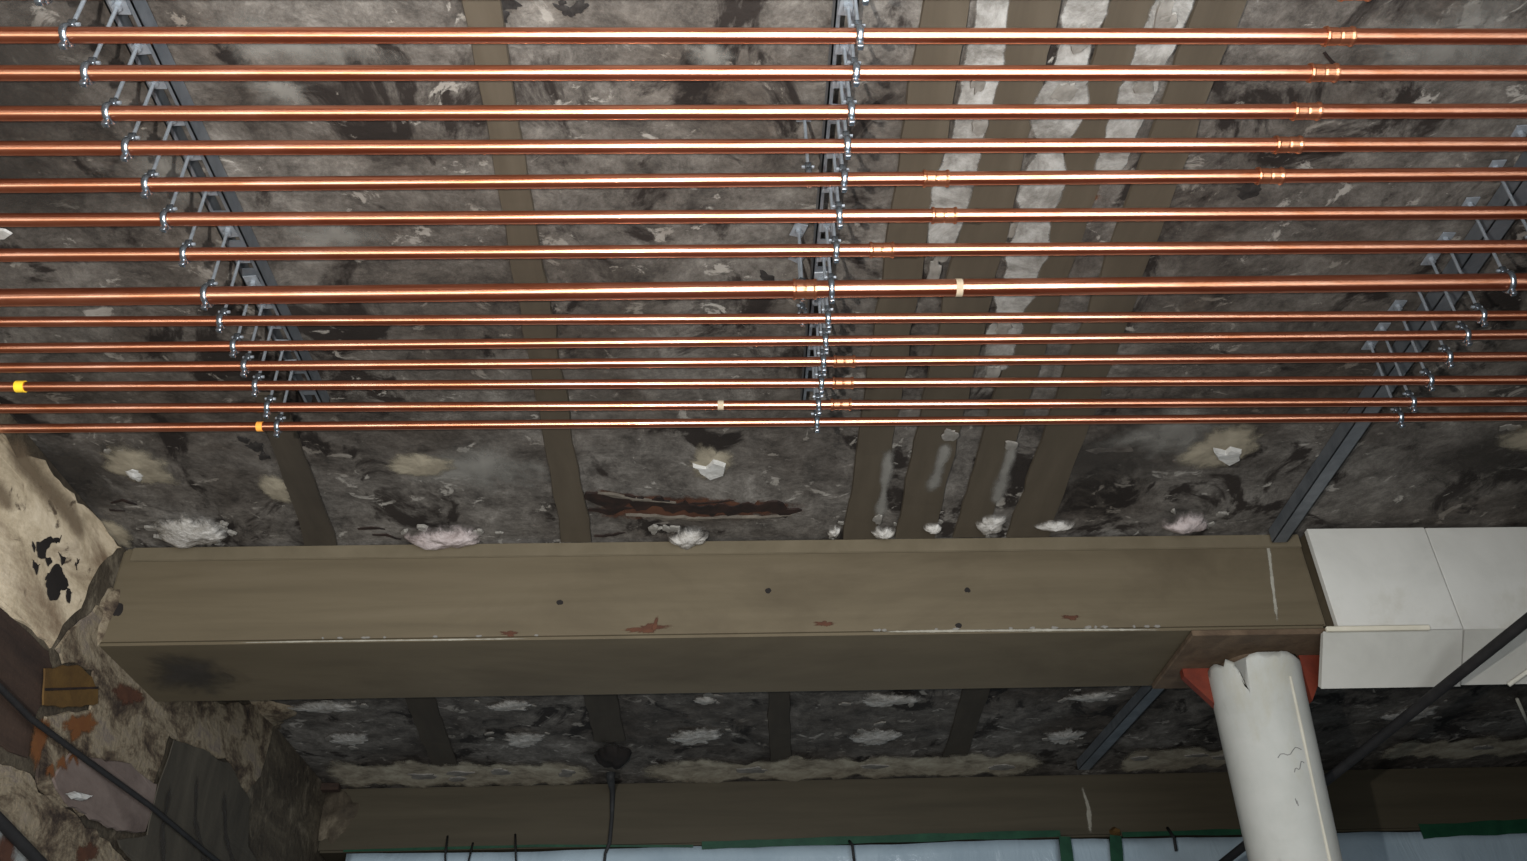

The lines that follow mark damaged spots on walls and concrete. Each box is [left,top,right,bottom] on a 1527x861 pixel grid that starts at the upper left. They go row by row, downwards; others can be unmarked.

flaking render [0,433,273,861]